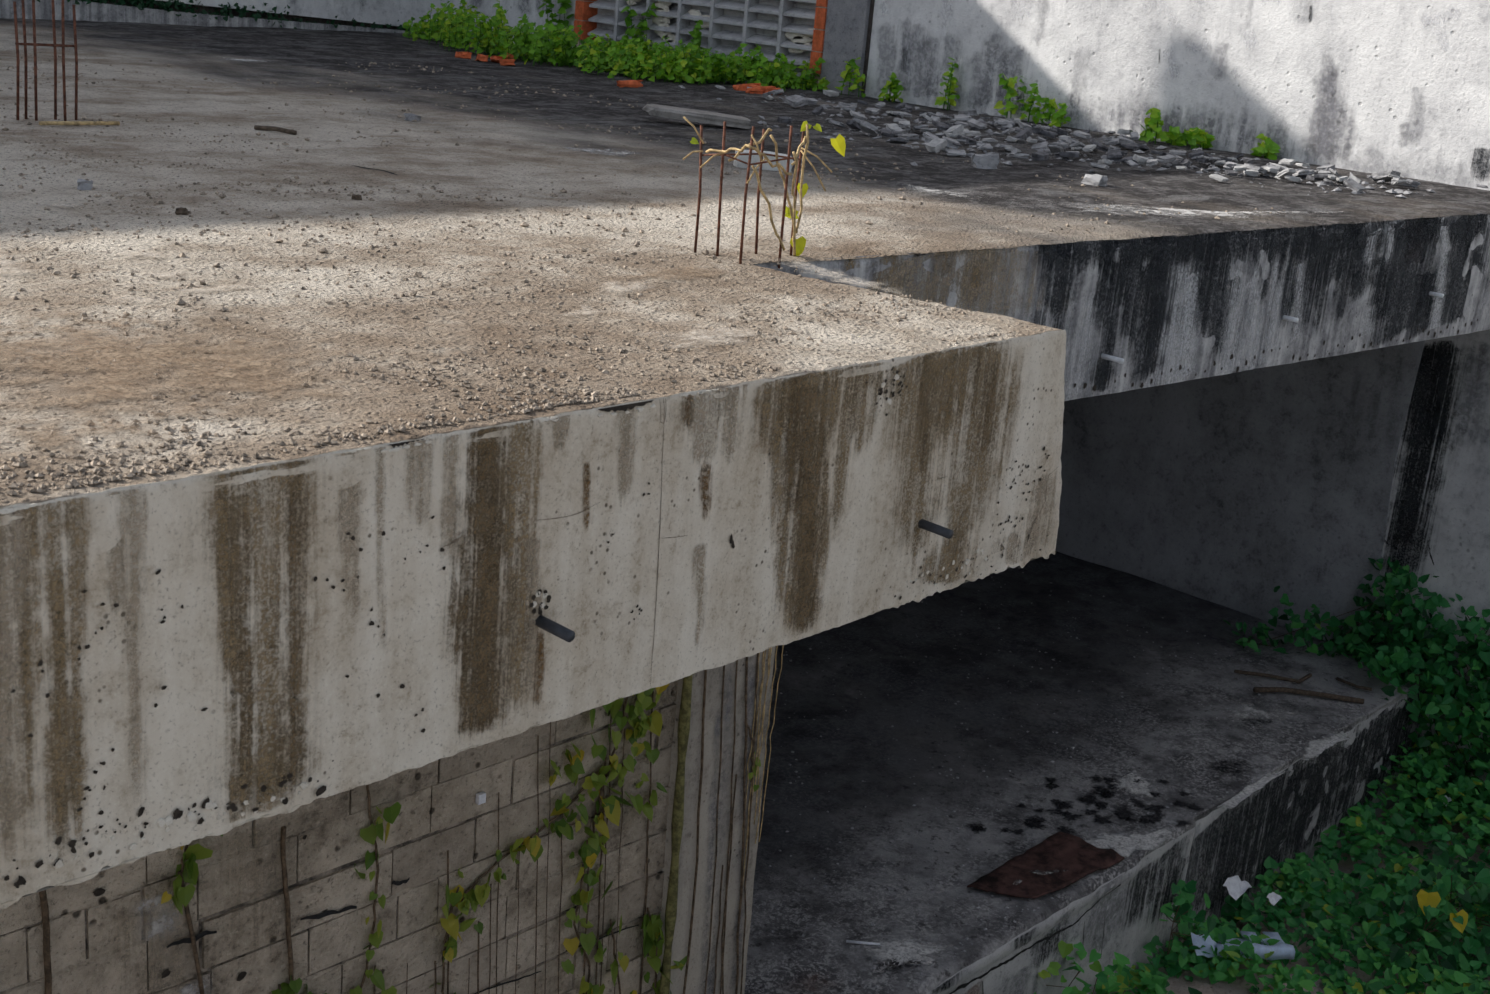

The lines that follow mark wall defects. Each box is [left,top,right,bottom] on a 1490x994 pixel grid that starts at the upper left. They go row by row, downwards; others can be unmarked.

damp [1471,148,1490,180]
damp [0,498,90,833]
damp [109,489,147,778]
damp [209,461,316,897]
damp [408,416,569,731]
damp [619,408,634,493]
damp [681,342,1020,641]
damp [868,208,1490,573]